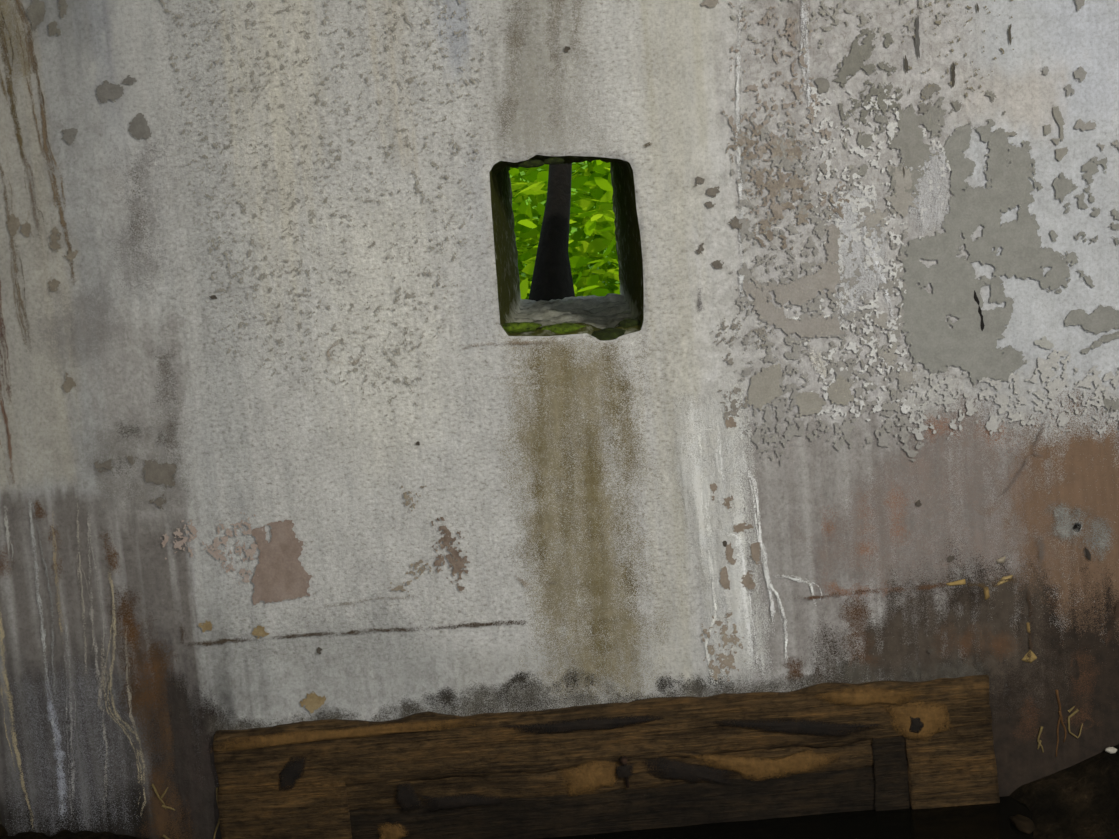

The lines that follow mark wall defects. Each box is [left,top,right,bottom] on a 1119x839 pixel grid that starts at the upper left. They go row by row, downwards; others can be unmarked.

damp [799,1,813,110]
rust [0,0,76,488]
damp [735,5,746,296]
damp [824,187,893,330]
peeling [695,0,1119,466]
damp [903,145,951,237]
peeling [160,512,312,605]
spalling [401,485,426,512]
spalling [390,517,471,596]
damp [0,330,1119,839]
rust [779,382,1119,663]